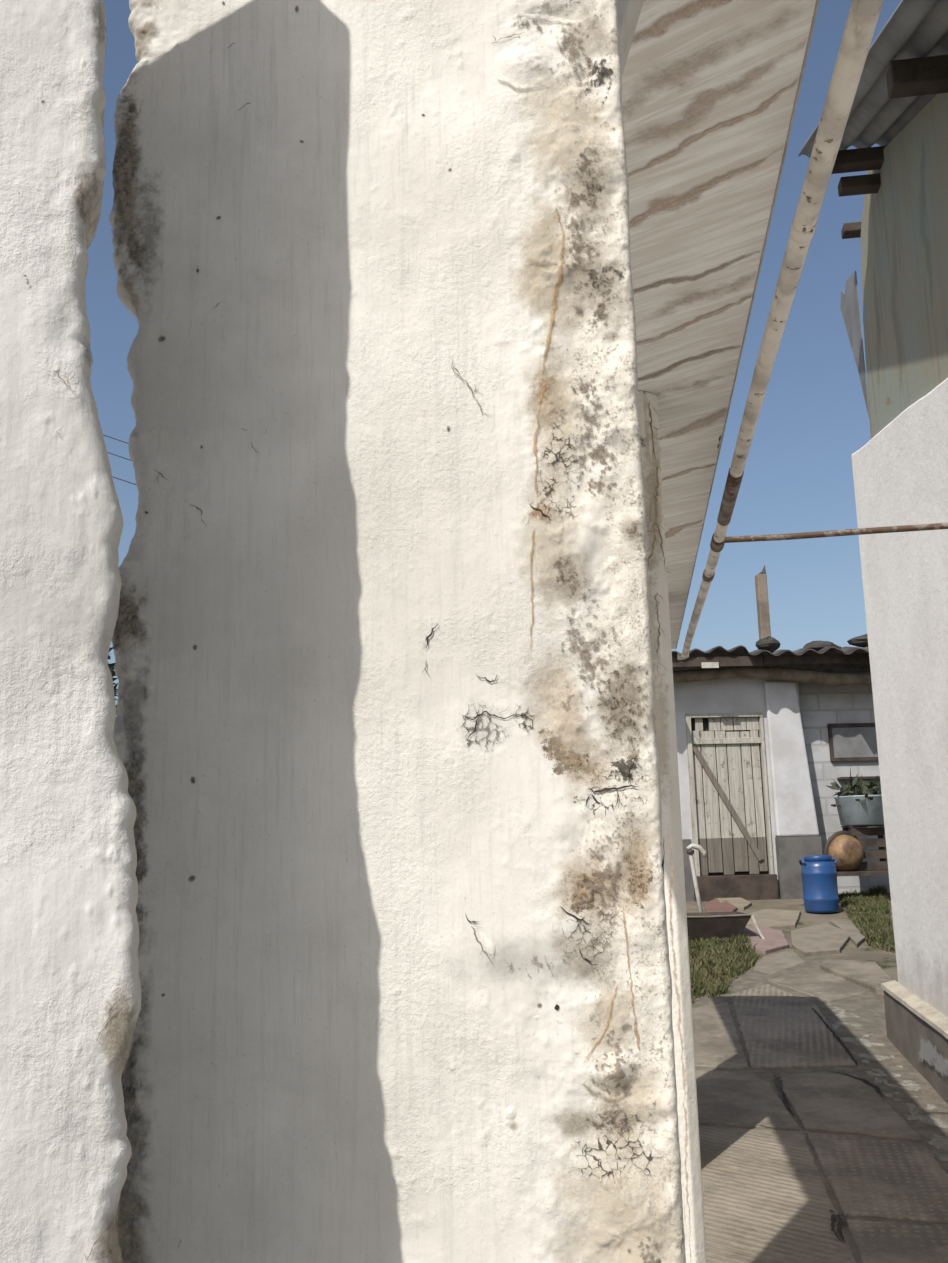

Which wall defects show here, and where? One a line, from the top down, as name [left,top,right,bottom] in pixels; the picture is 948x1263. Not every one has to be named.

water stain [550,23,613,103]
water stain [555,141,763,327]
corrosion [533,211,564,492]
water stain [560,370,625,497]
water stain [625,522,642,537]
crack [457,674,538,752]
water stain [554,558,648,767]
water stain [571,821,631,947]
water stain [591,1024,640,1126]
crack [570,1127,666,1186]